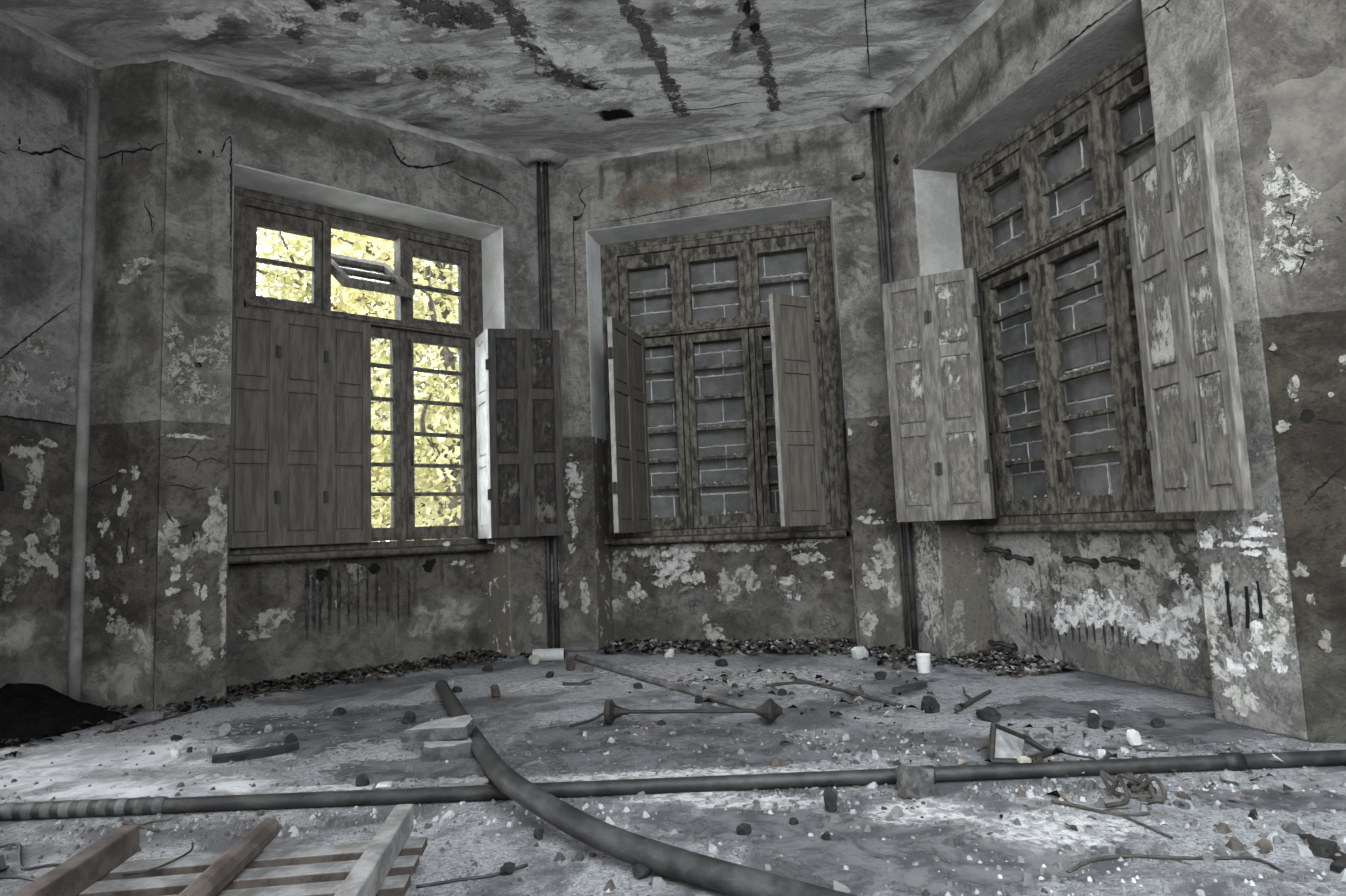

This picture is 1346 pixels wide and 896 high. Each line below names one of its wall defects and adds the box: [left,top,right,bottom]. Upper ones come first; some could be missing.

peeling [394,0,589,90]
crack [965,0,1171,126]
crack [0,136,165,165]
crack [198,136,232,264]
flaking render [1258,147,1324,277]
peeling [0,438,61,578]
peeling [97,466,296,667]
water stain [312,564,473,638]
peeling [528,454,590,625]
peeling [611,509,943,646]
water stain [1031,613,1158,650]
peeling [1006,512,1310,717]